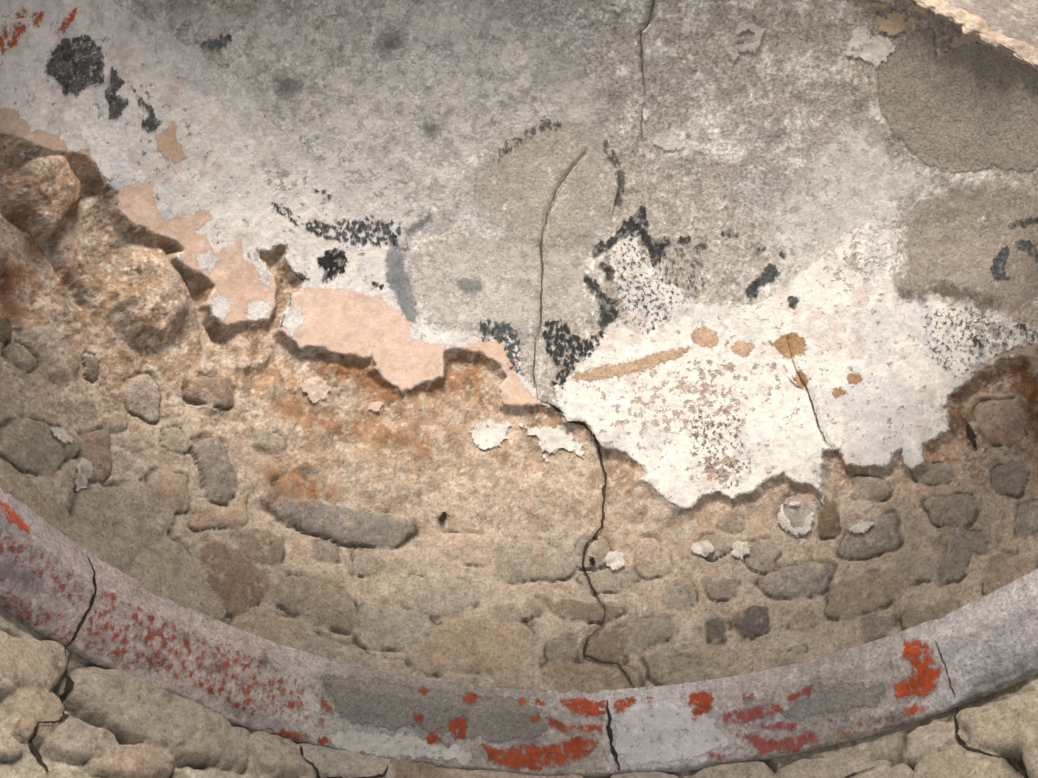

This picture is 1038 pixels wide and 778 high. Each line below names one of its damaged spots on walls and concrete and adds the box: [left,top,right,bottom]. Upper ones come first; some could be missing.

corrosion [0,10,44,53]
peeling [843,1,929,68]
crack [631,0,655,148]
peeling [196,249,219,274]
peeling [571,347,688,383]
peeling [770,332,806,358]
crack [533,156,635,688]
crack [28,556,97,772]
corrosion [480,696,653,771]
crack [606,700,620,778]
corrosion [688,685,818,755]
corrosion [837,638,941,739]